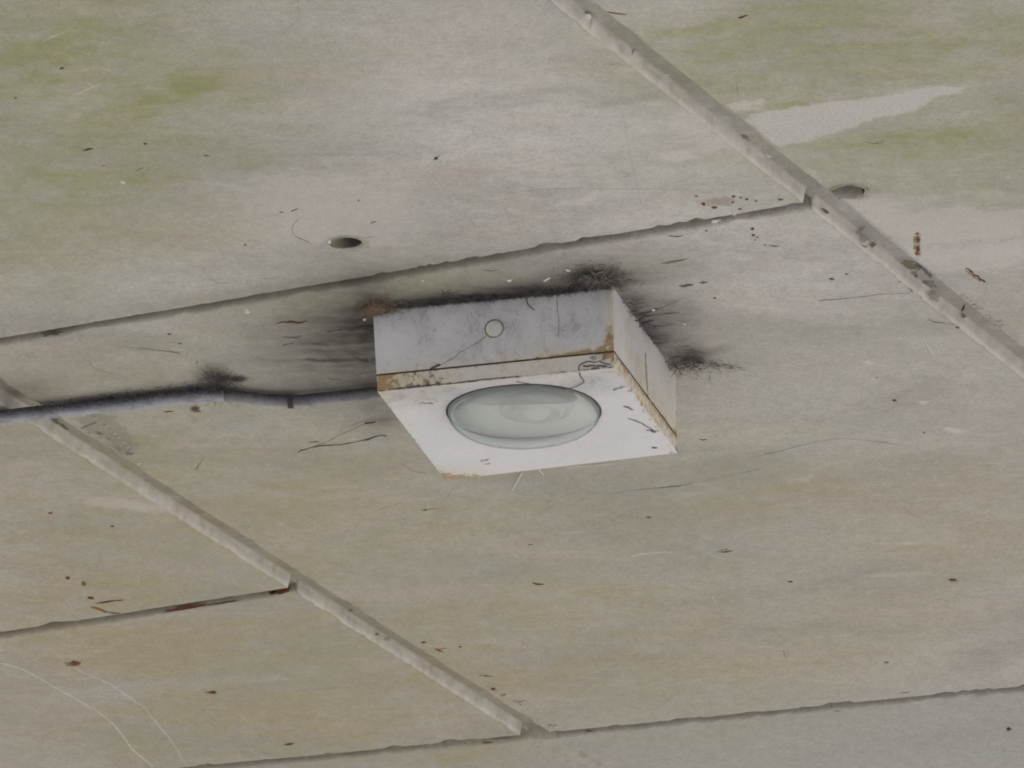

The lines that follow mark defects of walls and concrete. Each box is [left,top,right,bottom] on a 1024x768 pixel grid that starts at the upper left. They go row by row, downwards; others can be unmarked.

leakage [625,83,979,166]
crack [298,421,386,453]
corrosion [165,600,240,612]